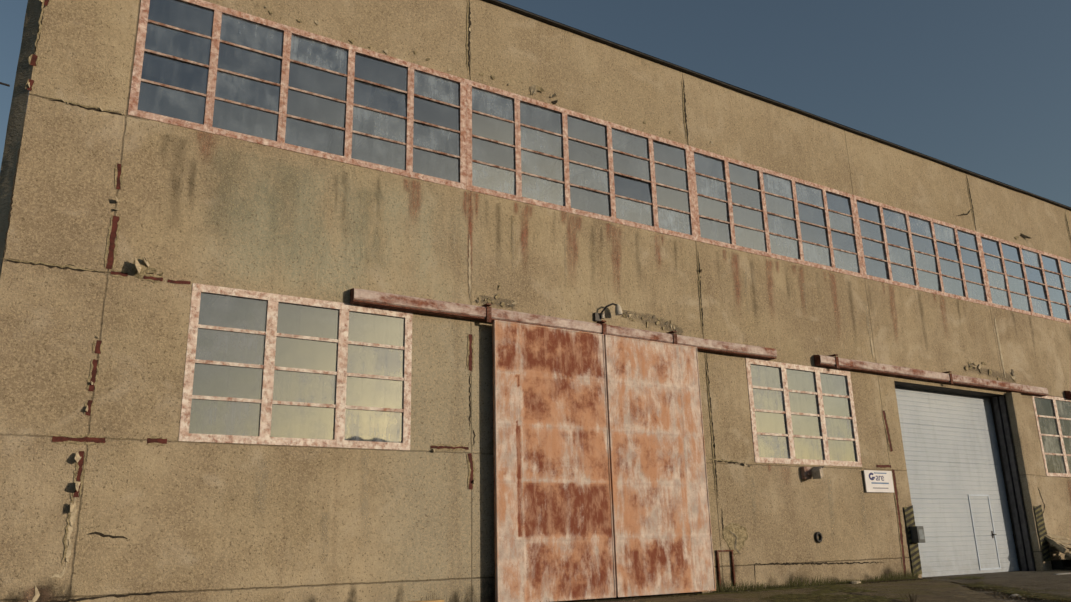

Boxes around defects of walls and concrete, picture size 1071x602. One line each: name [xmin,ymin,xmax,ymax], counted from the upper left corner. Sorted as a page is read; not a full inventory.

crack [48,495,183,602]